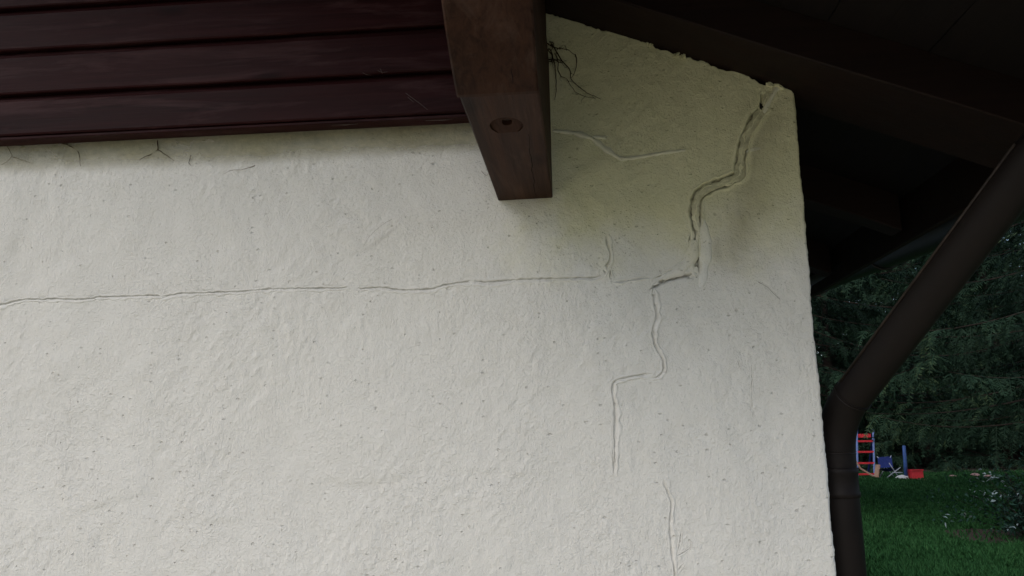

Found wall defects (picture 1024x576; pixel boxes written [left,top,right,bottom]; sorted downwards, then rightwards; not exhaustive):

crack [0,87,784,477]
crack [661,479,693,576]